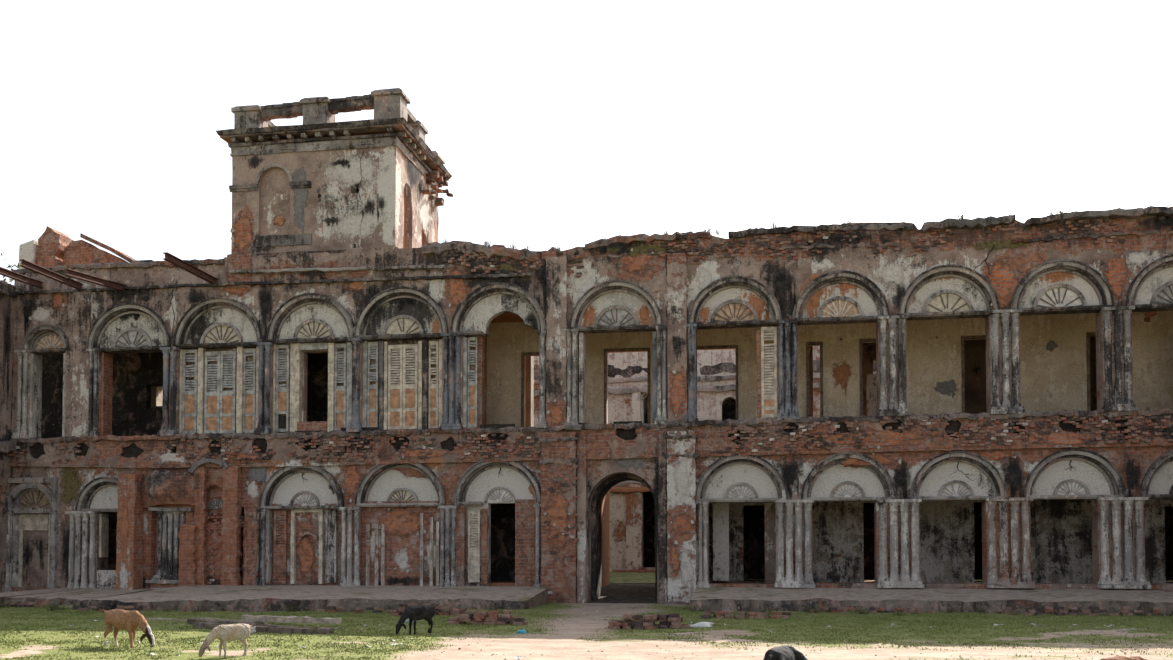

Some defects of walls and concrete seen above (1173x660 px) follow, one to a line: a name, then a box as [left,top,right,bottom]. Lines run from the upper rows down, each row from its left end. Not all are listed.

water stain [406,150,422,200]
water stain [362,197,384,218]
flaking render [230,210,254,254]
flaking render [617,248,655,275]
flaking render [985,260,1019,309]
flaking render [1104,252,1155,299]
peeling [151,449,184,463]
peeling [246,481,259,498]
peeling [119,562,132,590]
peeling [670,541,695,586]